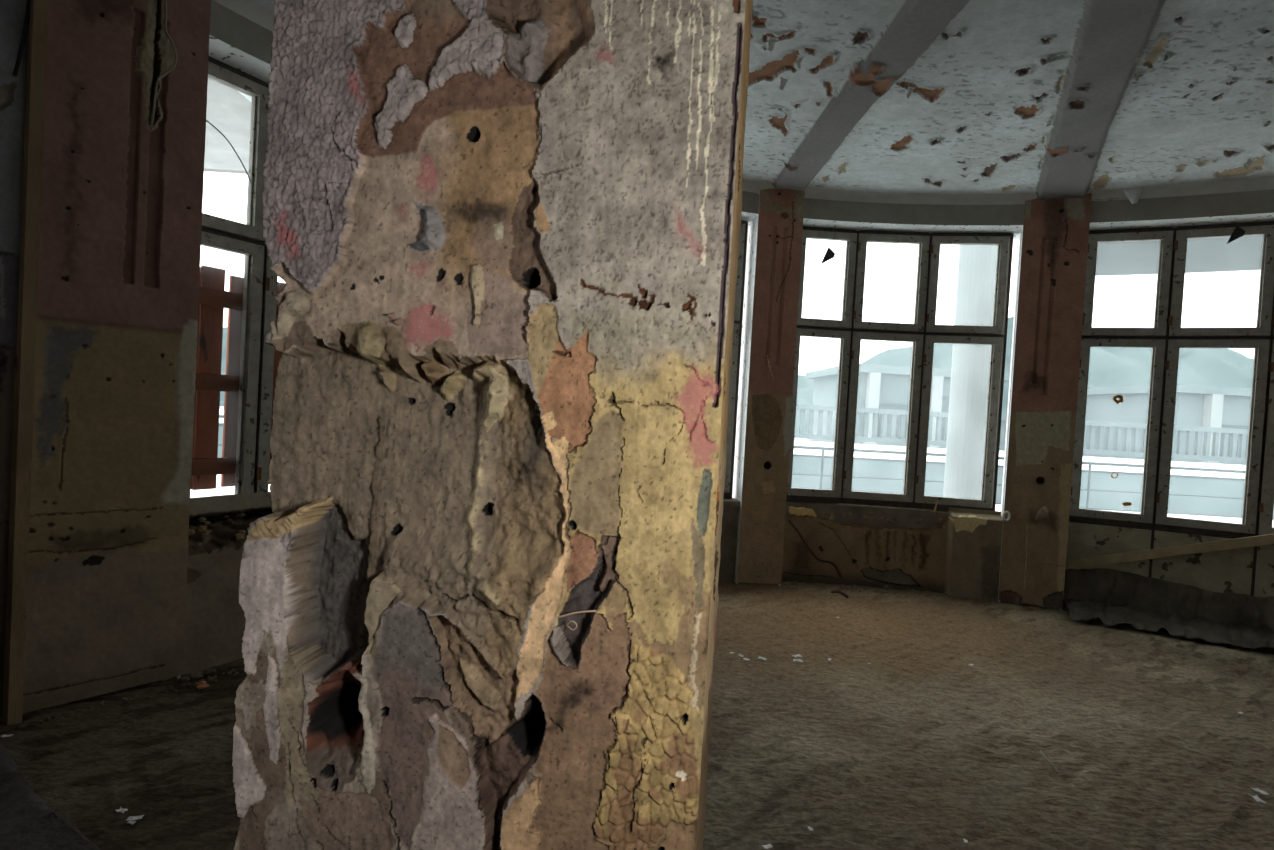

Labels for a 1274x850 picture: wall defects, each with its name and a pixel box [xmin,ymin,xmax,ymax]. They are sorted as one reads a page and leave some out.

peeling [853,31,870,45]
peeling [1015,38,1079,77]
peeling [849,64,946,103]
peeling [1212,67,1238,101]
peeling [890,135,914,152]
peeling [958,75,1116,191]
peeling [1169,145,1274,182]
spalling [239,0,700,850]
crack [553,350,714,839]
peeling [232,725,267,817]